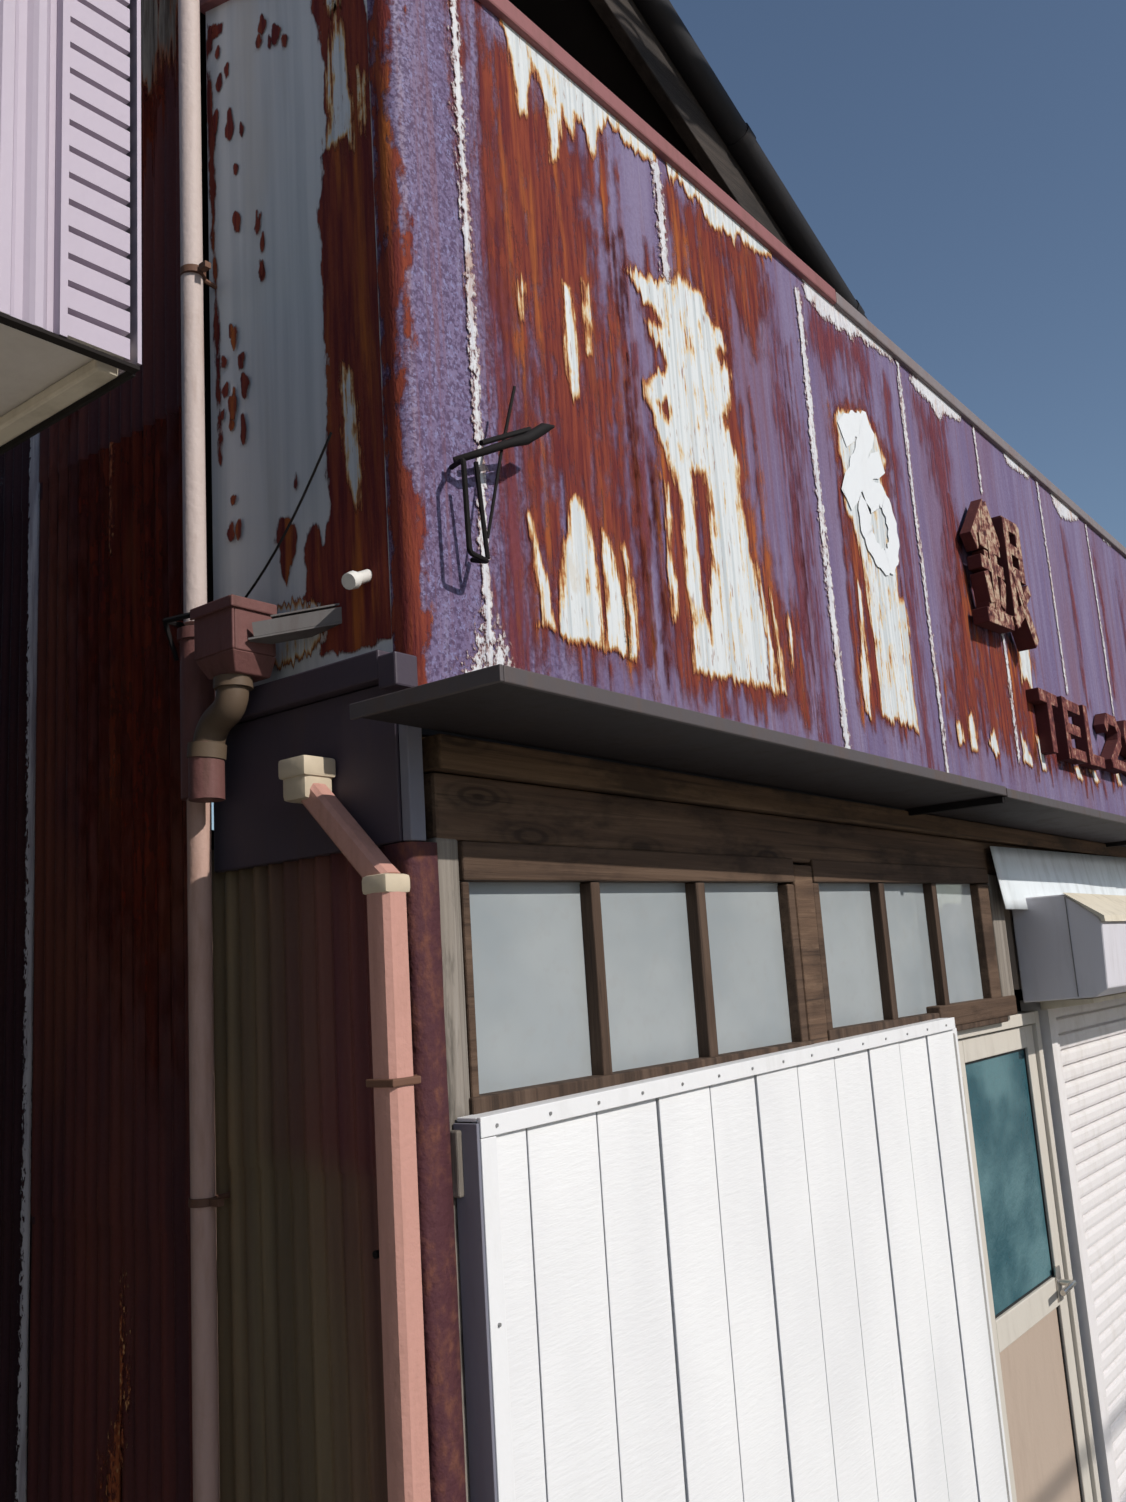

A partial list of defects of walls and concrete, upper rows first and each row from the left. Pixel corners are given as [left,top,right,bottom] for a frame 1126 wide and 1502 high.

rust [227,495,242,542]
rust [206,23,265,466]
rust [255,13,287,49]
rust [276,0,433,686]
rust [449,0,831,744]
peeling [499,18,794,699]
peeling [794,279,1048,774]
rust [802,300,1126,798]
rust [97,1272,131,1502]